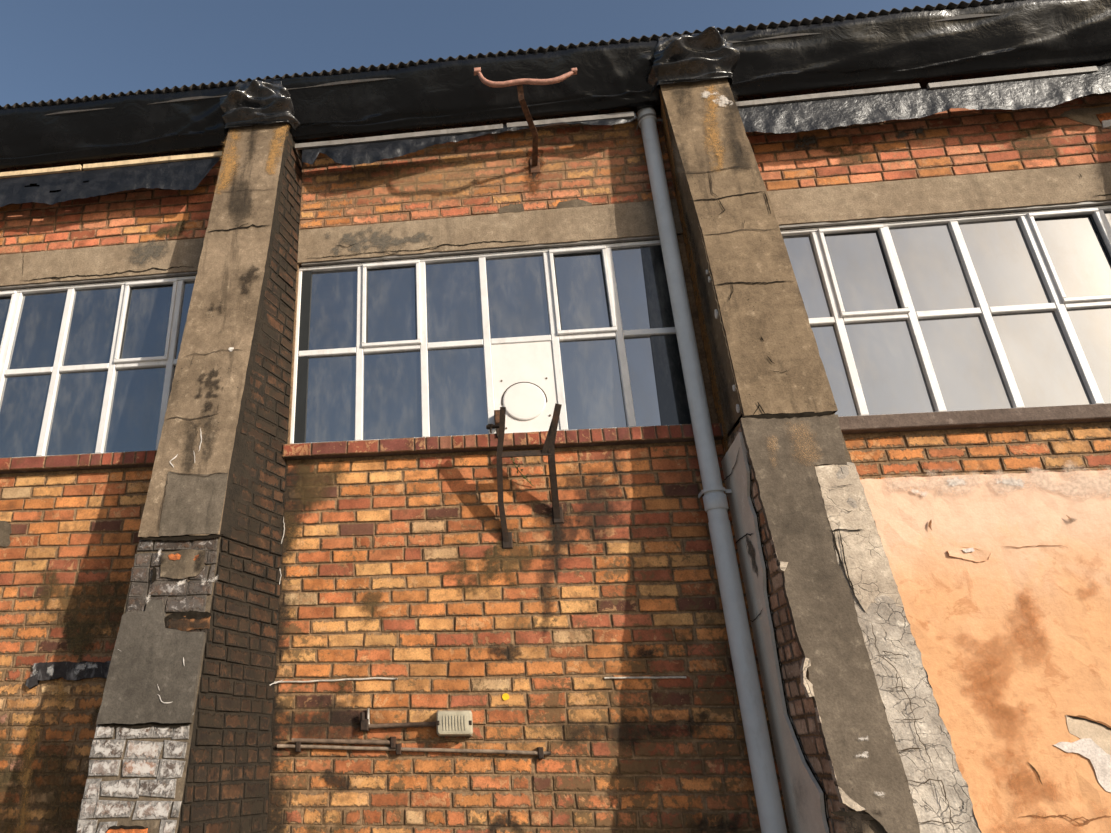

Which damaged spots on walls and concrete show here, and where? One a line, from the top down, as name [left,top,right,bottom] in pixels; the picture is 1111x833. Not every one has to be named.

crack [685,142,776,235]
crack [743,401,834,419]
spalling [157,549,217,587]
leakage [485,530,540,586]
crack [833,485,862,594]
spalling [164,610,211,633]
spalling [800,657,822,726]
crack [871,623,956,831]
flaking render [1054,715,1111,792]
spalling [106,825,148,833]
leakage [488,815,524,833]
crack [1020,814,1111,825]